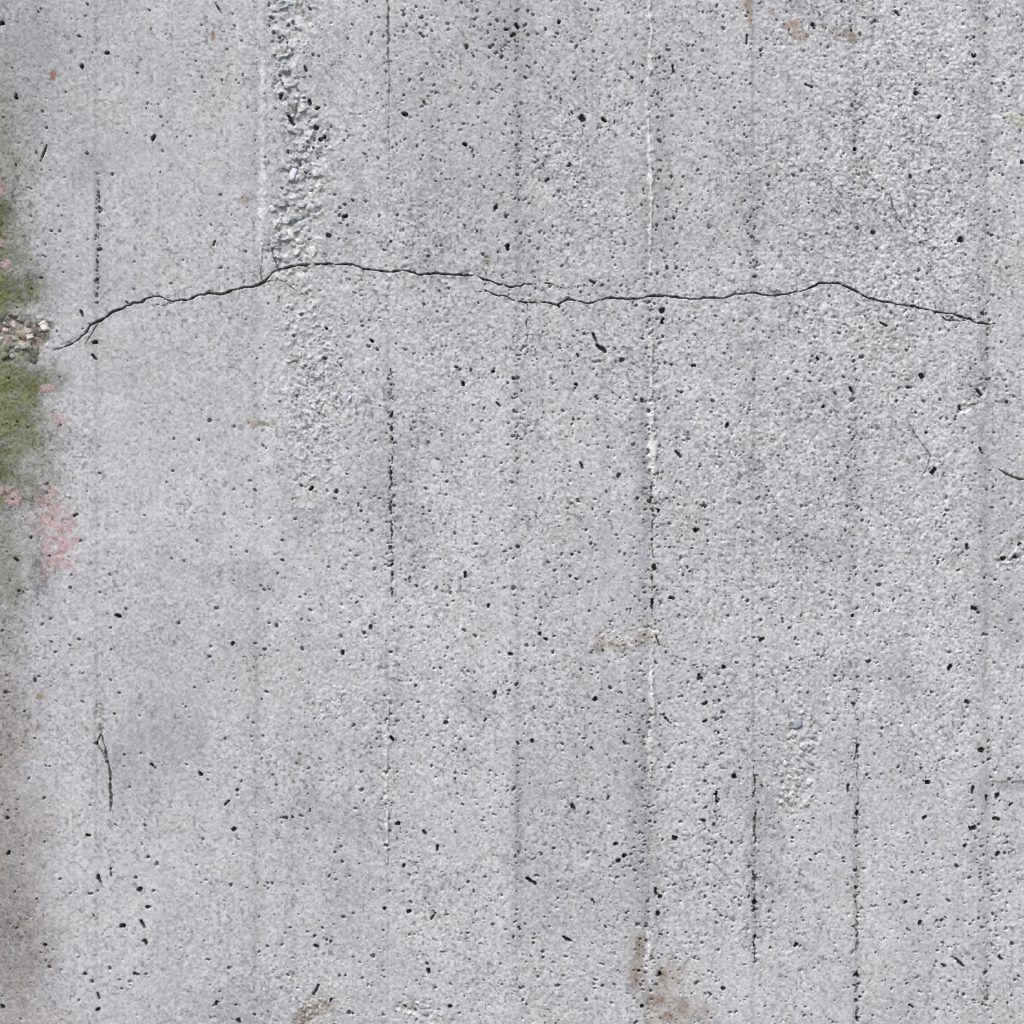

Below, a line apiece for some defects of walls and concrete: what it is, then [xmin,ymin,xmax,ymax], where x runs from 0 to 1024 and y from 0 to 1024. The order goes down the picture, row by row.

crack [65,248,987,347]